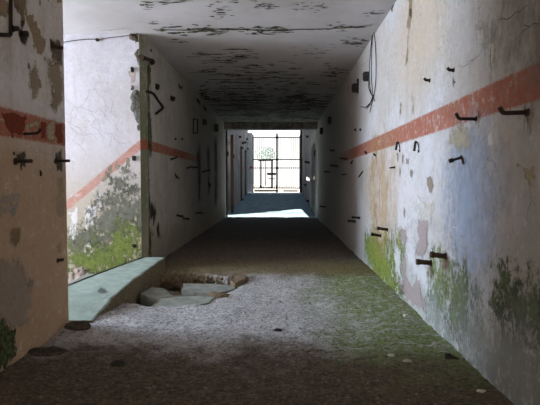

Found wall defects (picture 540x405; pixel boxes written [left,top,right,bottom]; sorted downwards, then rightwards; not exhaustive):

peeling [0,0,64,111]
crack [461,5,528,78]
peeling [2,112,63,145]
mould [68,169,141,257]
peeling [394,196,434,310]